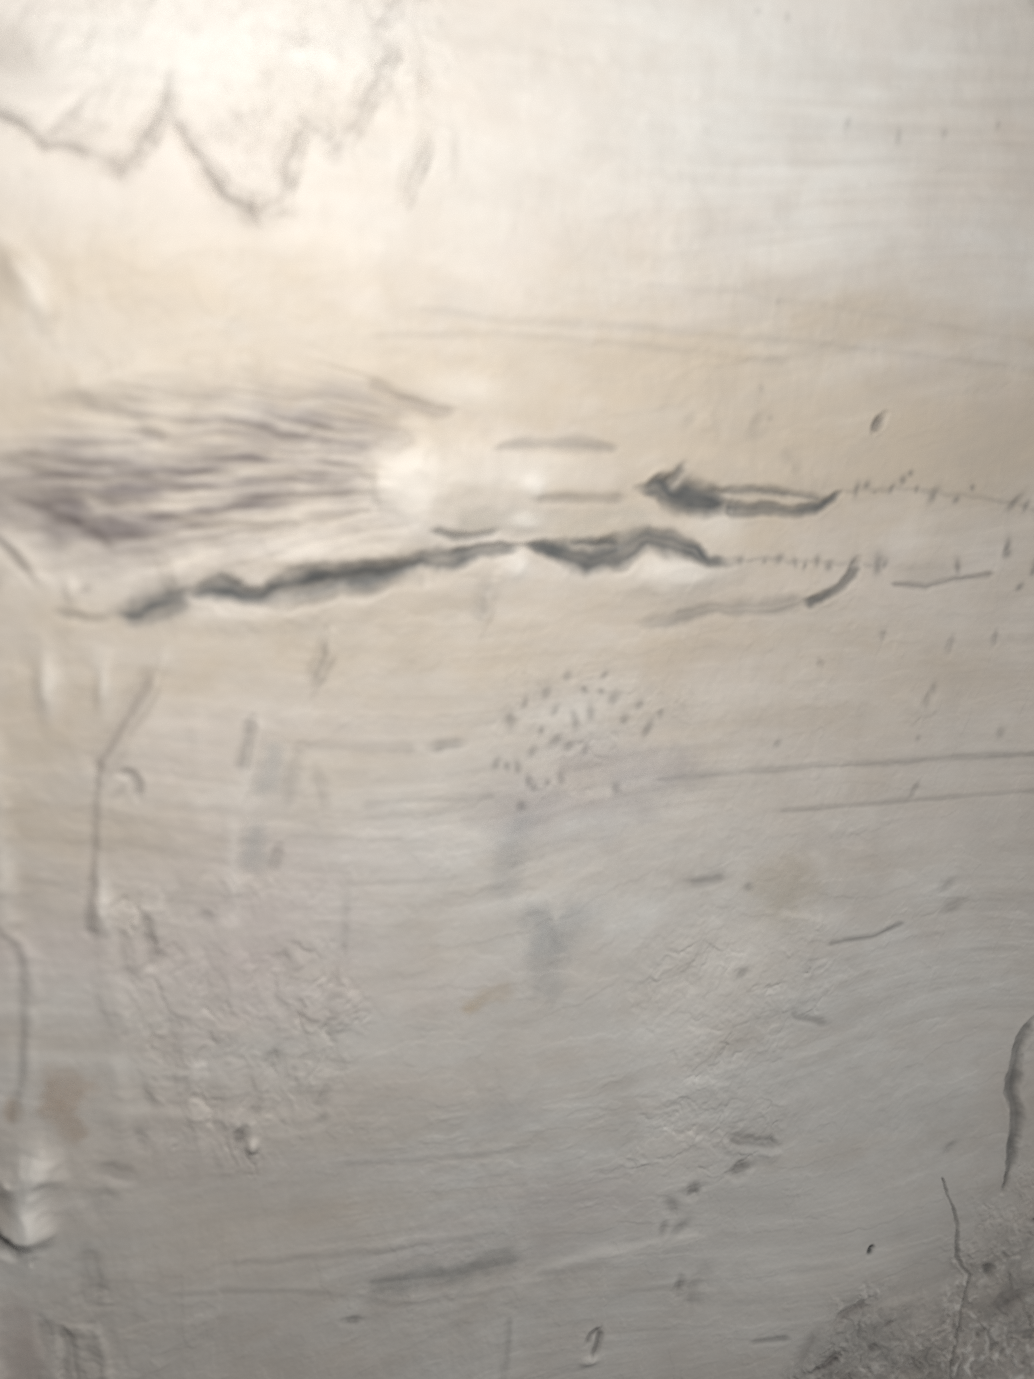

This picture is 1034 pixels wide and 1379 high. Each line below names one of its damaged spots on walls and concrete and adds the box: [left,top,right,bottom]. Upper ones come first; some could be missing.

crack [47,461,1034,639]
crack [996,1012,1034,1197]
spalling [786,1214,1034,1379]